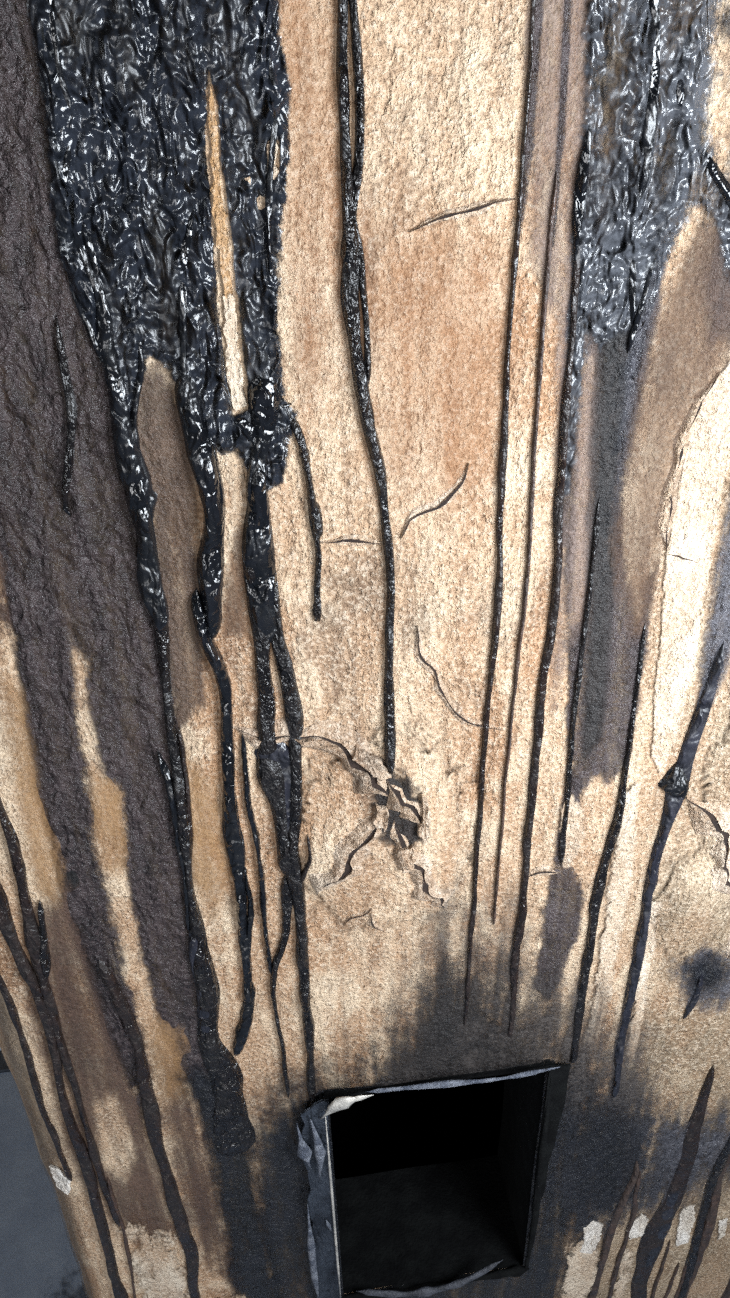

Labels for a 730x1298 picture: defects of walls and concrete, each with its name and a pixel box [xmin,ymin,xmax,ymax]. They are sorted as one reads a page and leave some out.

damp [56,315,77,512]
damp [407,0,730,1298]
damp [0,363,322,1298]
crack [233,718,456,909]
crack [343,908,385,932]
spalling [675,1204,696,1246]
spalling [717,1218,728,1240]